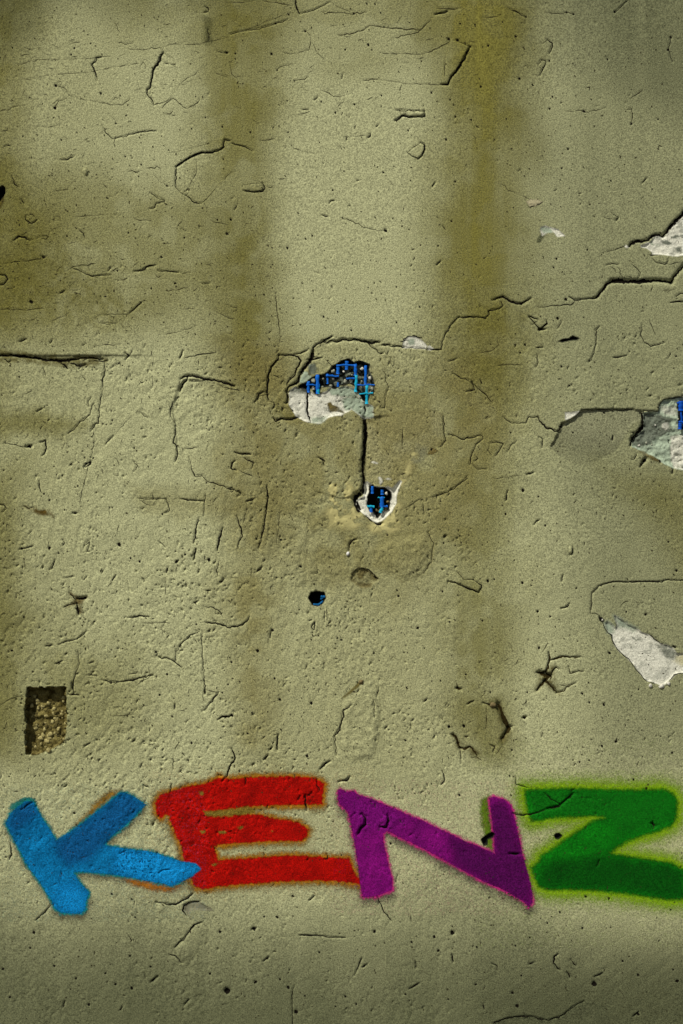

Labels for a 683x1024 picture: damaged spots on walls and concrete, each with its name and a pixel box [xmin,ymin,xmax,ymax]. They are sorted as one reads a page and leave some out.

crack [23,0,470,139]
crack [131,138,299,224]
spalling [641,217,683,257]
crack [0,177,683,593]
peeling [289,359,445,523]
peeling [551,397,683,470]
crack [441,579,683,785]
spalling [605,611,683,690]